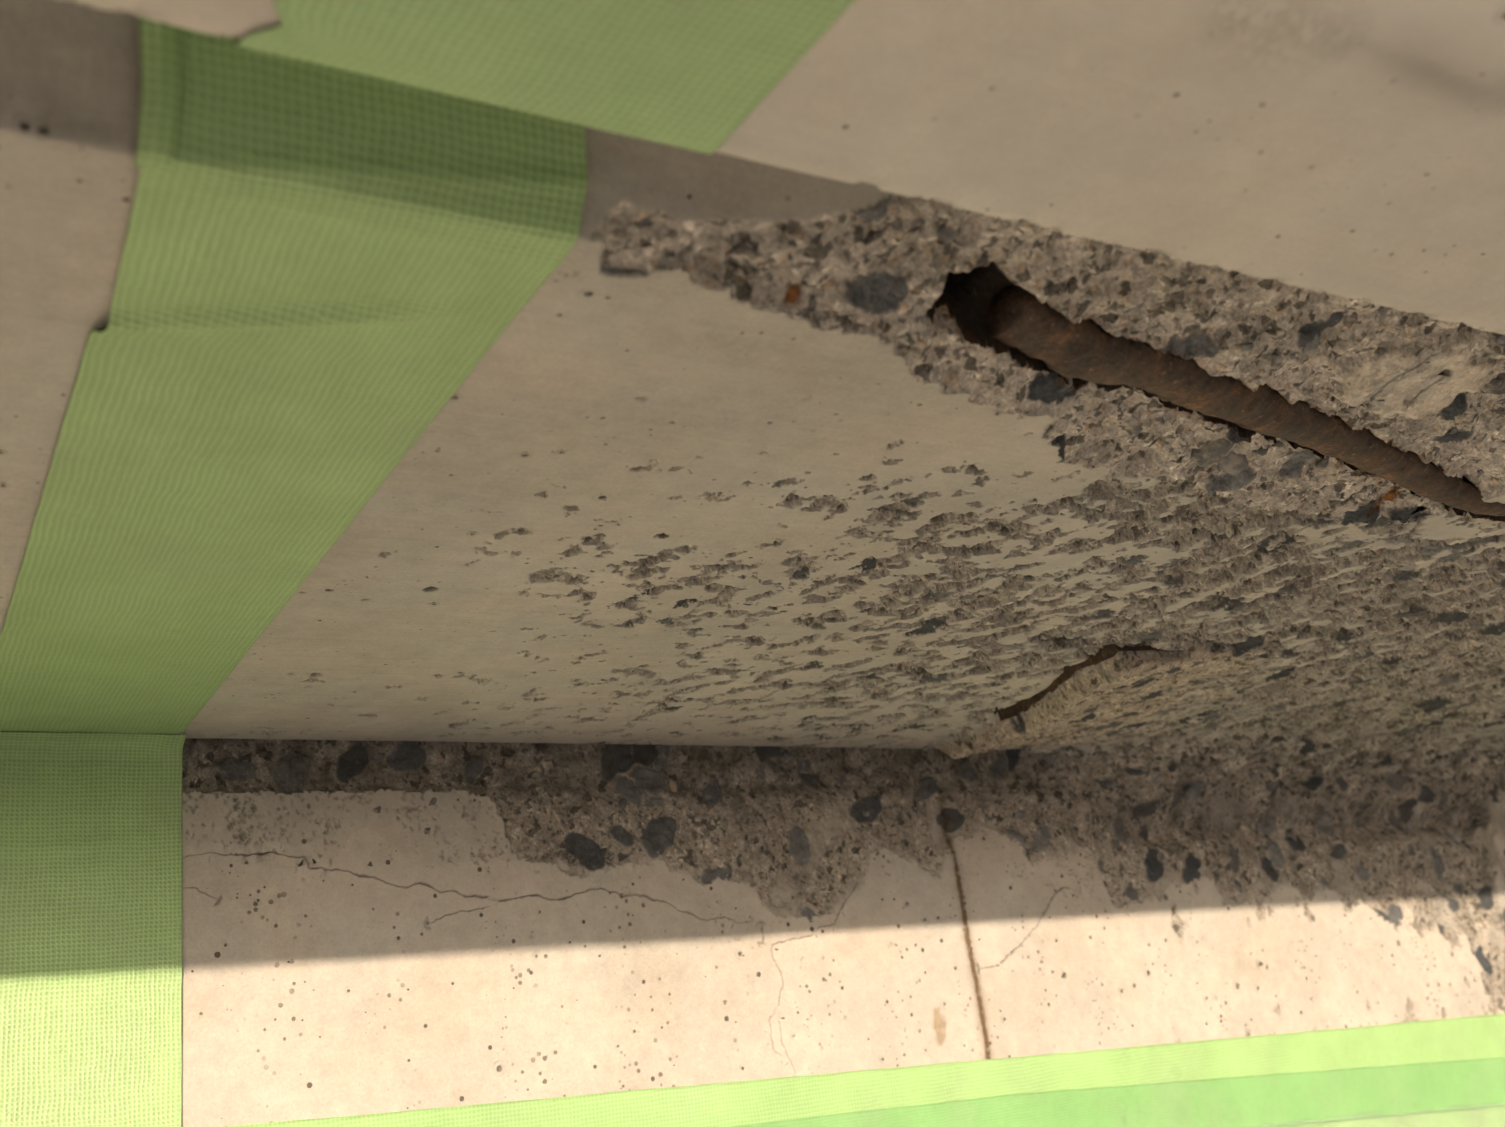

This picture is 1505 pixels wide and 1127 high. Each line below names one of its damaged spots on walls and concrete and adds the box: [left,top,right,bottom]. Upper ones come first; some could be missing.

corrosion [988,285,1505,516]
spalling [182,193,1505,1015]
crack [182,842,864,1077]